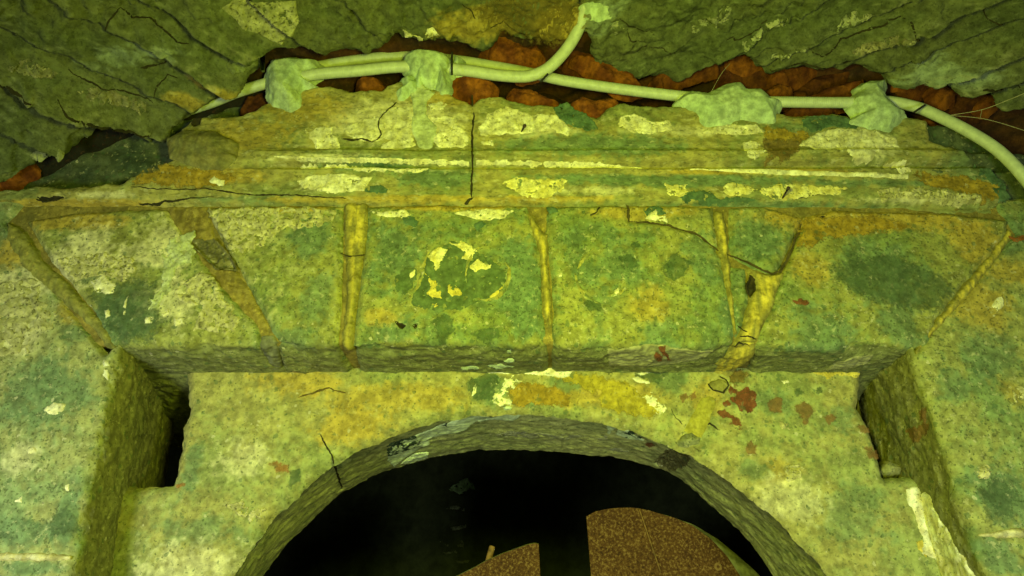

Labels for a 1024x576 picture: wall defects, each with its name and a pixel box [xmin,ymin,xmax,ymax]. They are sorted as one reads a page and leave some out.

crack [343,102,397,142]
peeling [274,102,642,214]
crack [464,95,475,205]
peeling [664,115,911,207]
crack [138,186,346,206]
crack [626,205,802,275]
peeling [394,240,506,345]
damp [834,254,953,314]
peeling [461,350,574,400]
corrosion [654,346,671,362]
corrosion [717,369,782,430]
corrosion [796,401,813,424]